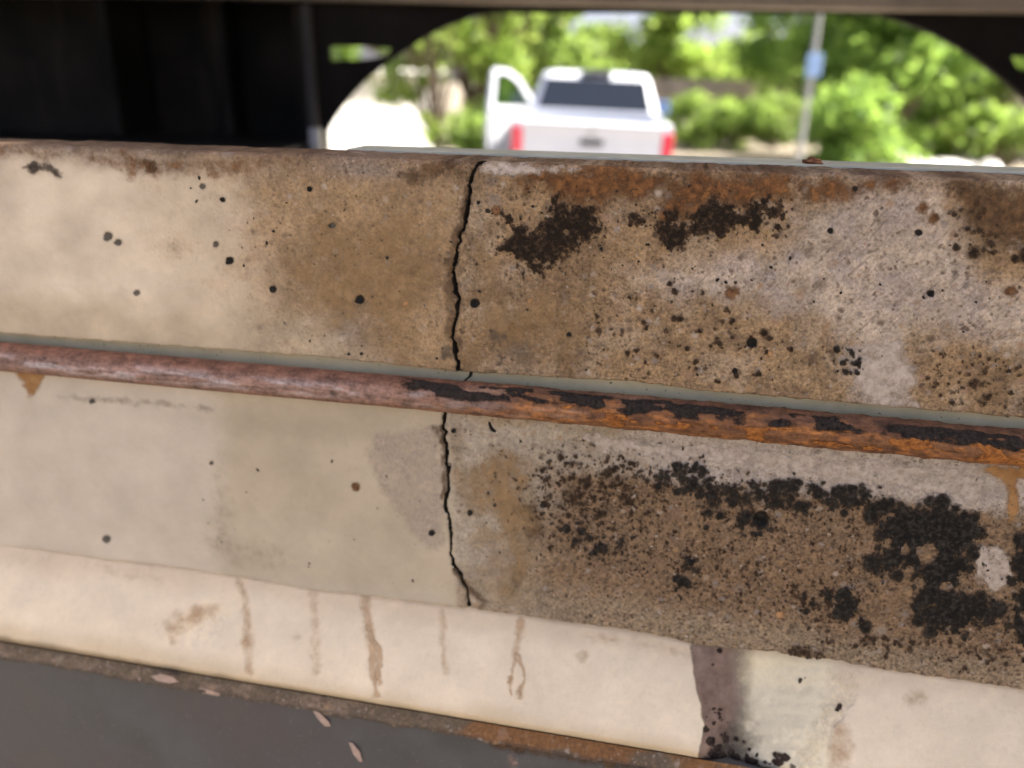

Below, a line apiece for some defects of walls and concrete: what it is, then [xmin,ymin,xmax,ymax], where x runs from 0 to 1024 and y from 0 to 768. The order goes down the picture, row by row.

crack [444,155,492,381]
leakage [491,186,803,279]
corrosion [518,160,900,222]
corrosion [916,203,940,223]
corrosion [954,172,1024,243]
leakage [594,281,811,390]
corrosion [17,373,44,395]
crack [440,412,483,606]
corrosion [811,431,934,451]
corrosion [965,443,1024,518]
leakage [471,440,1024,673]
leakage [363,607,382,697]